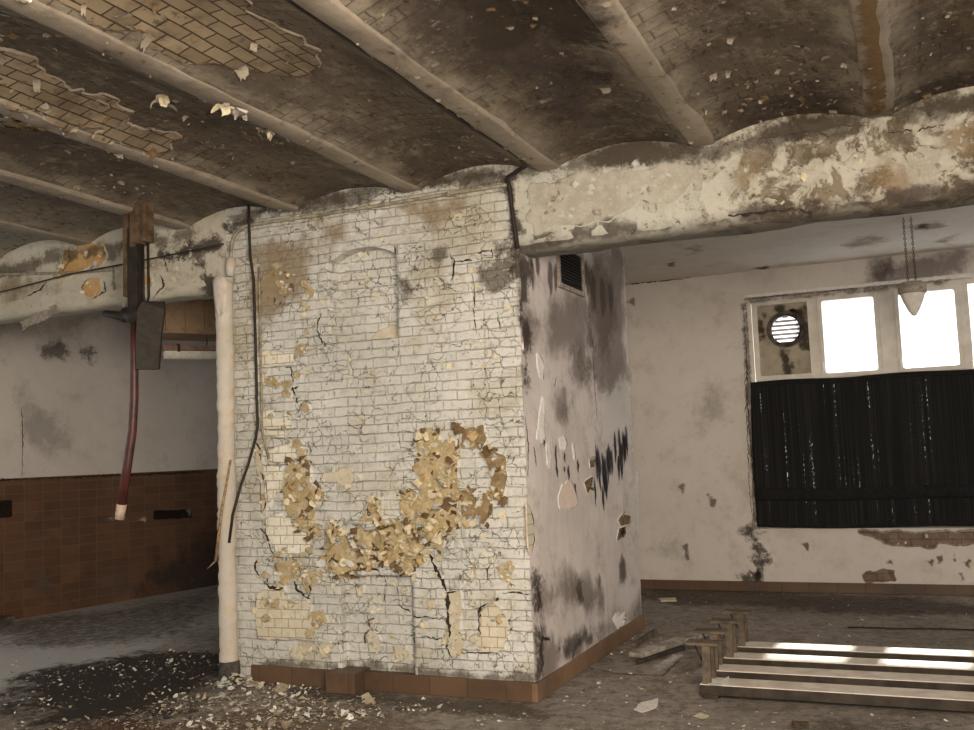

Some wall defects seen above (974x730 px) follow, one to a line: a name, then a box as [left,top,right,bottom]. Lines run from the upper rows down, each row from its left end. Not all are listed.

flaking render [54,0,324,81]
water stain [462,0,625,52]
water stain [894,72,974,122]
water stain [568,113,869,170]
peeling [53,242,109,300]
water stain [585,414,638,542]
peeling [254,409,512,664]
water stain [737,480,772,581]
flaking render [857,528,974,550]
crack [364,534,550,672]
water stain [531,567,543,615]
flaking render [862,568,897,583]